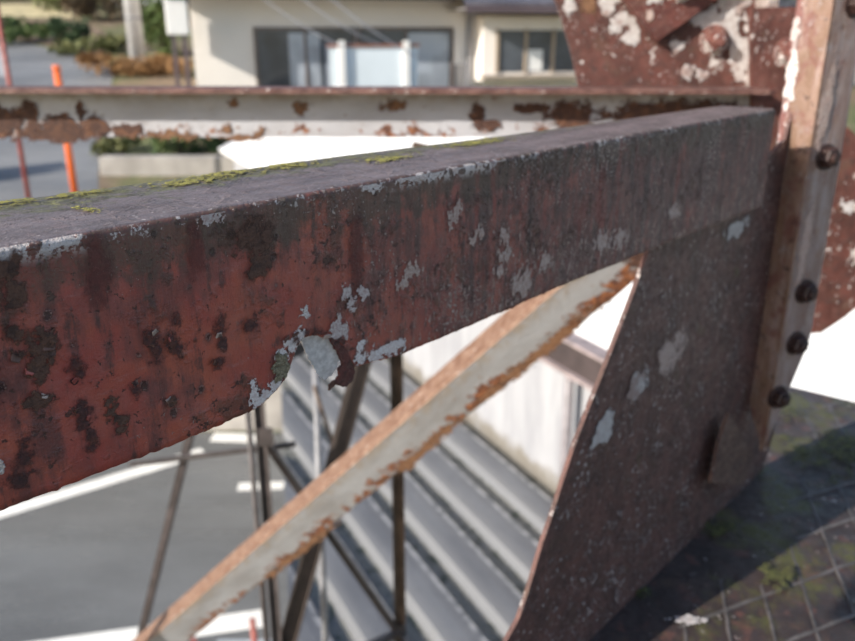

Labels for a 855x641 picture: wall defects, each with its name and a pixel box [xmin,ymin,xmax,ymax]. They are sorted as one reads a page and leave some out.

peeling [562,0,577,17]
peeling [598,0,663,47]
peeling [689,0,752,82]
rust [0,98,267,145]
rust [468,99,503,137]
rust [513,96,748,130]
peeling [839,200,855,215]
peeling [322,282,407,366]
peeling [248,304,311,408]
rust [329,338,355,387]
rust [365,296,614,498]
rust [74,395,131,452]